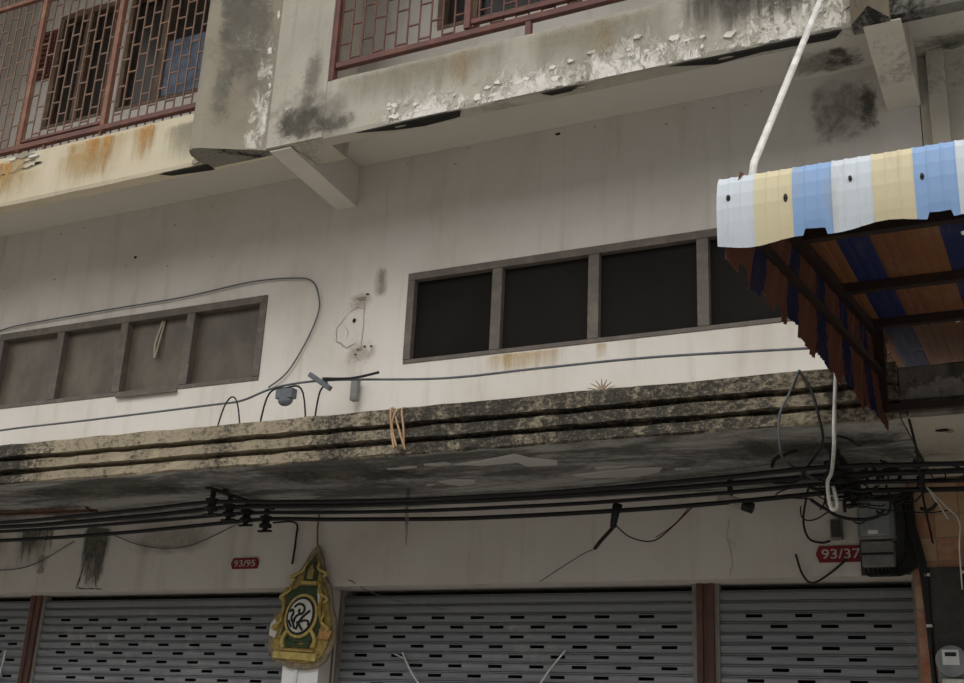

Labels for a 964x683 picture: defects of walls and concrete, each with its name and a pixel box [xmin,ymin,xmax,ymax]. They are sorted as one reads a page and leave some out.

peeling [234,33,274,149]
leakage [278,96,352,138]
peeling [356,0,846,133]
leakage [803,48,853,70]
leakage [825,87,875,132]
leakage [82,527,110,579]